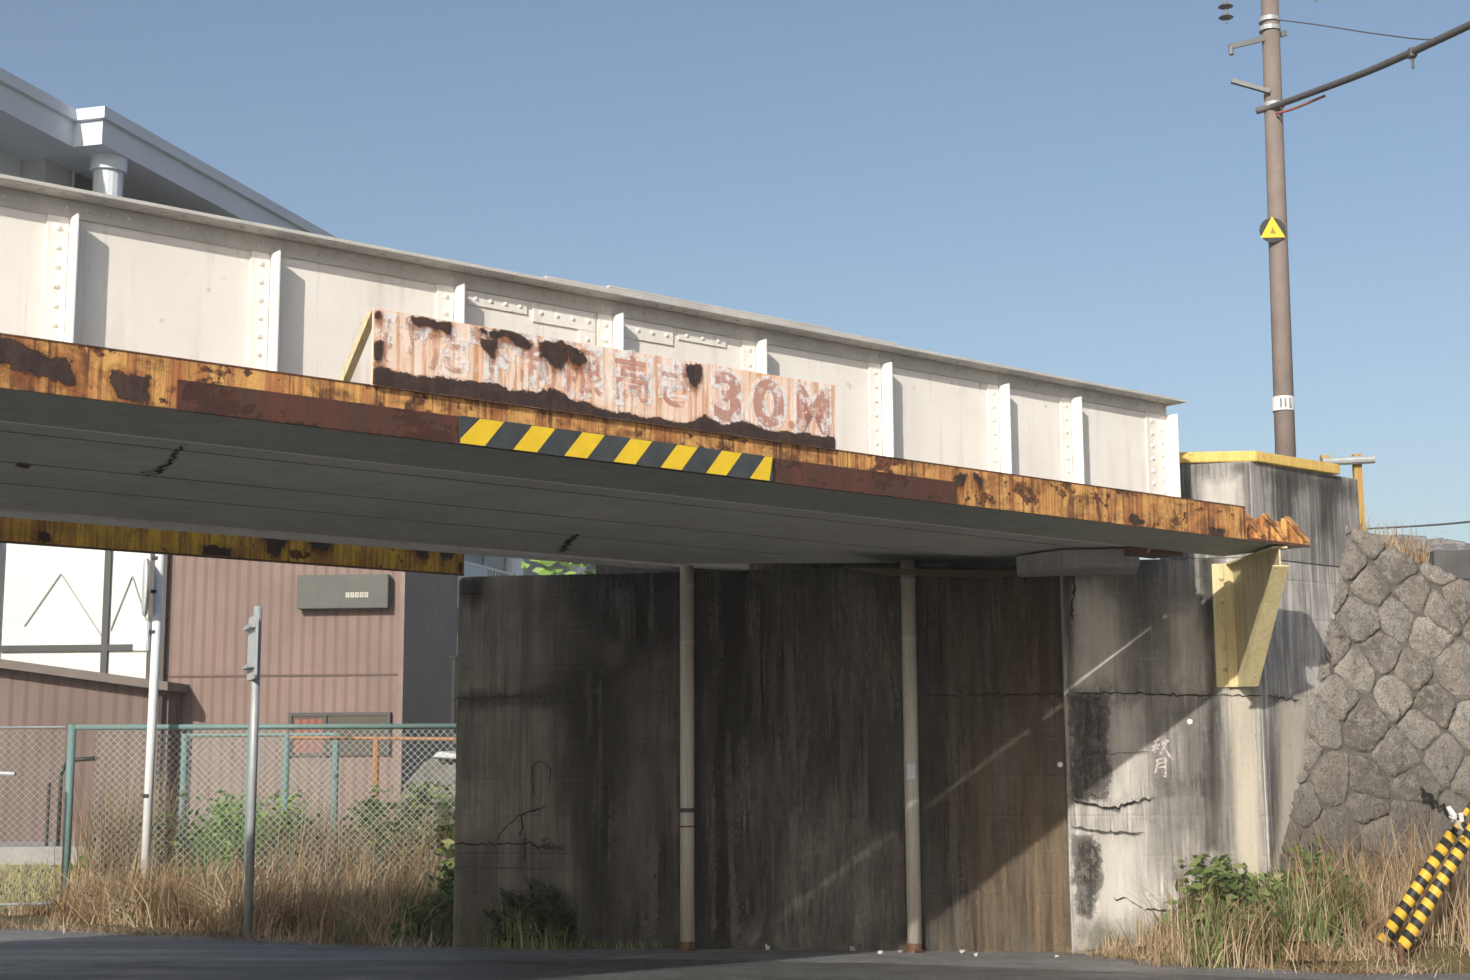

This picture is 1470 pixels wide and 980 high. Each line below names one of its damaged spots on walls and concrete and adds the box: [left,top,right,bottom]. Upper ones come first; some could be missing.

corrosion [0,337,80,393]
corrosion [109,370,151,405]
corrosion [373,310,835,449]
corrosion [951,472,984,490]
corrosion [1129,513,1145,526]
corrosion [202,545,232,556]
corrosion [263,538,288,560]
corrosion [413,550,462,572]
damp [459,572,674,948]
damp [694,558,1311,954]
crack [455,761,564,859]
crack [1071,797,1154,835]